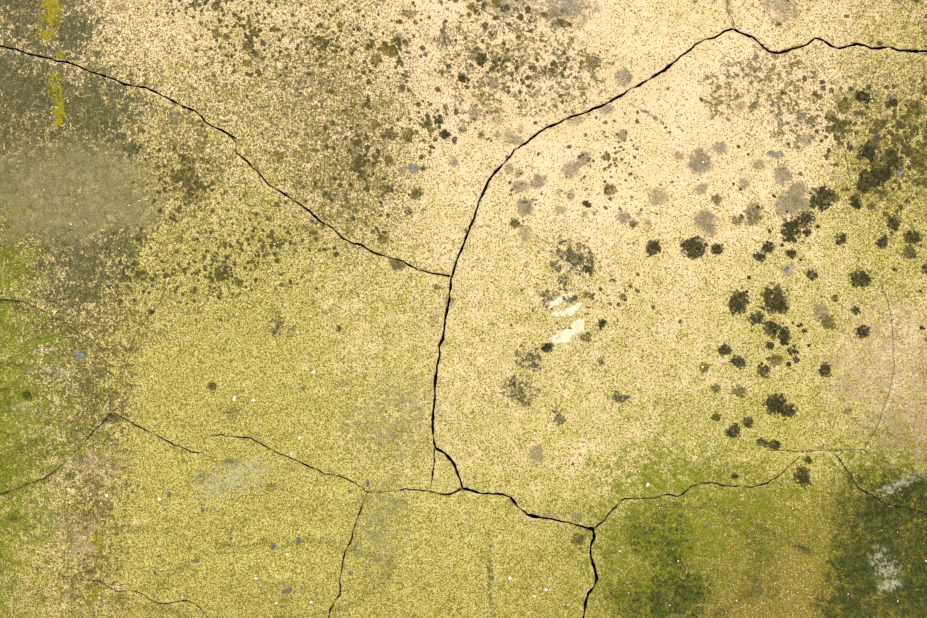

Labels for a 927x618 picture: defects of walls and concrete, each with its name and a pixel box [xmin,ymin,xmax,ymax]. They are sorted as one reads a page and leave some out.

crack [0,46,235,139]
damp [323,120,393,234]
damp [155,0,643,212]
mould [768,211,804,247]
mould [808,80,927,223]
crack [2,280,199,453]
damp [29,103,339,609]
crack [210,0,927,618]
mould [760,306,807,353]
damp [611,512,712,618]
damp [817,469,927,618]